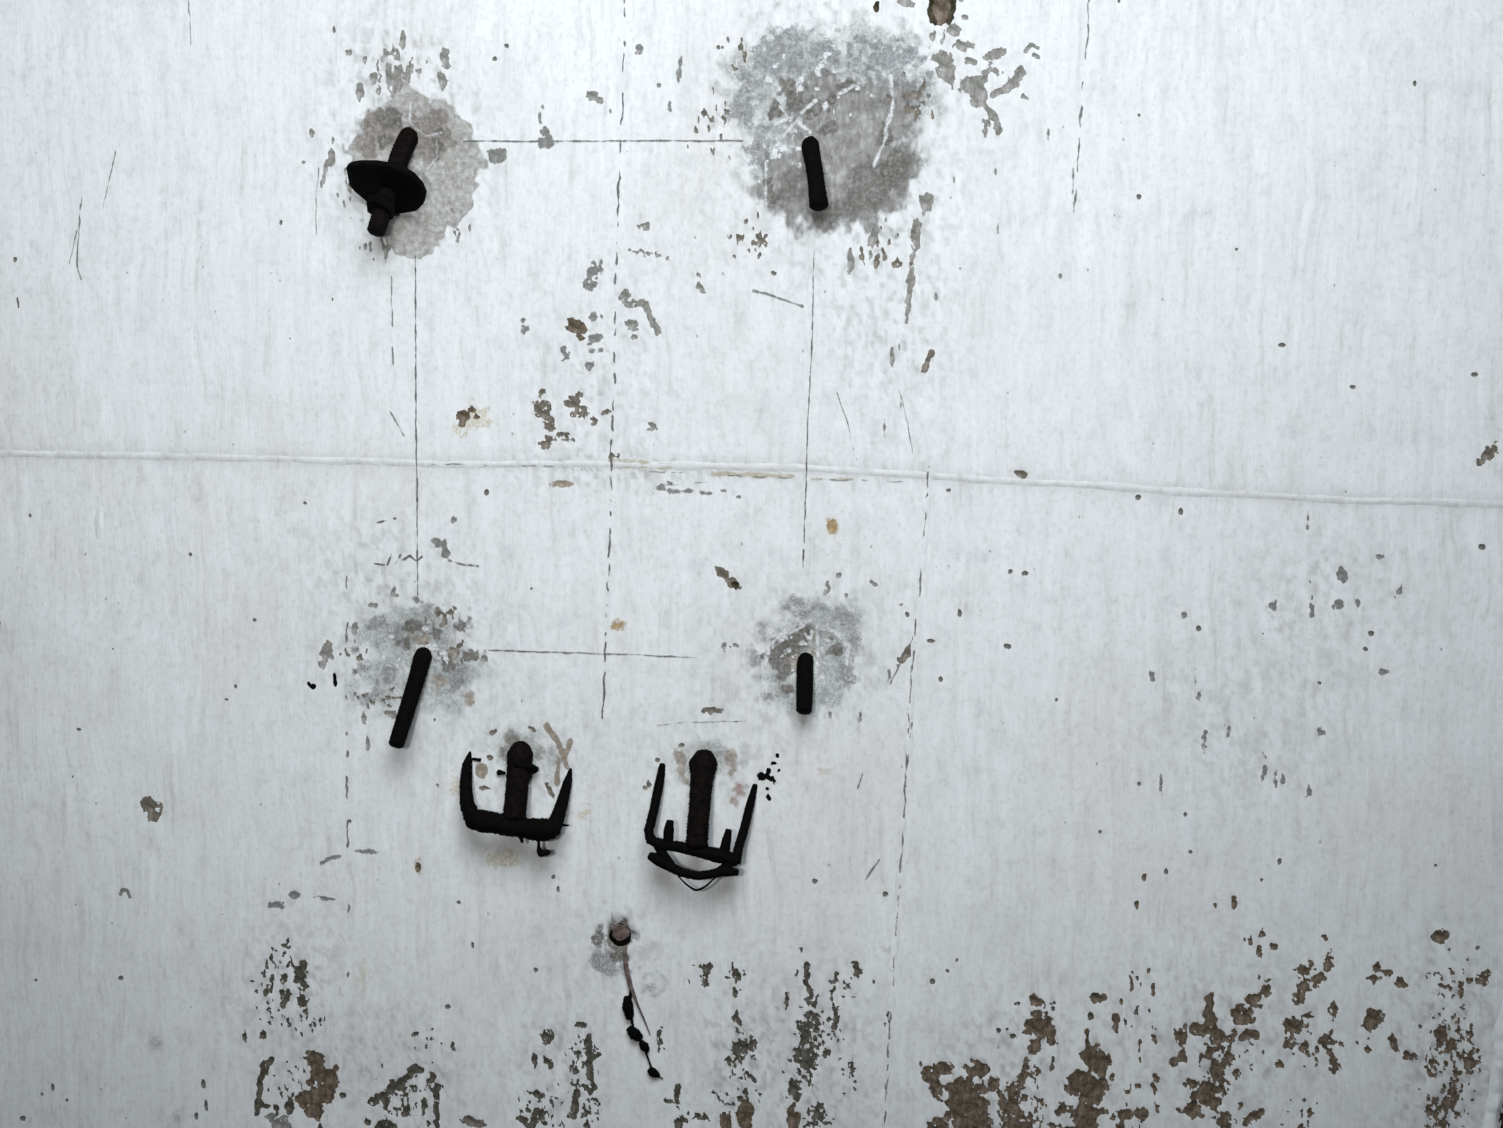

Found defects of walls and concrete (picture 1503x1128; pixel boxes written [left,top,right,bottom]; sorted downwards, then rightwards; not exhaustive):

peeling [242,937,346,1128]
peeling [364,1028,456,1128]
peeling [459,1115,487,1128]
peeling [516,1022,602,1128]
spalling [591,918,639,975]
peeling [664,962,762,1128]
peeling [782,947,875,1128]
peeling [919,928,1491,1128]